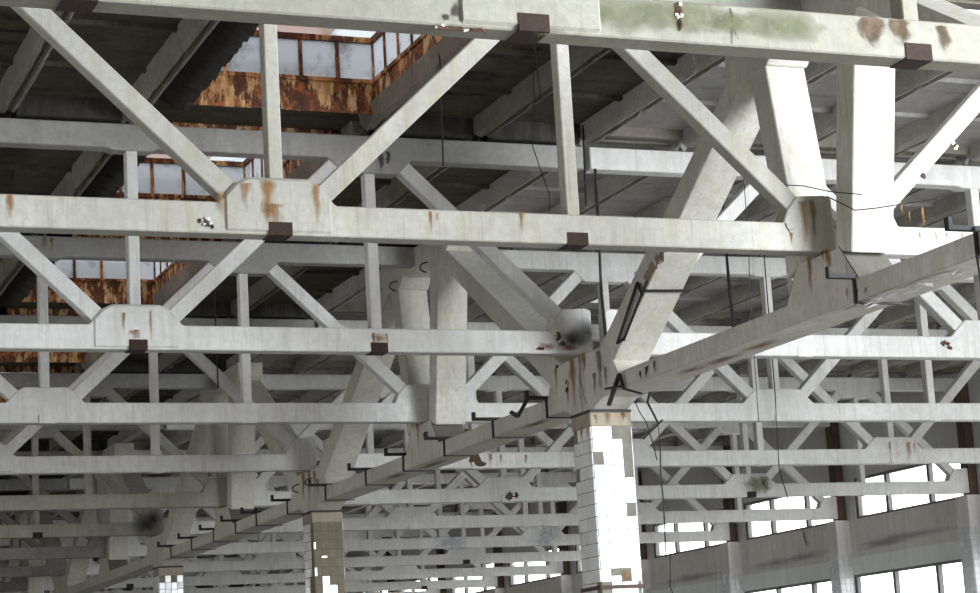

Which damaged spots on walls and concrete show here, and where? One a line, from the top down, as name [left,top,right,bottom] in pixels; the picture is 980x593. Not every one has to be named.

corrosion [263,181,279,217]
corrosion [801,200,815,225]